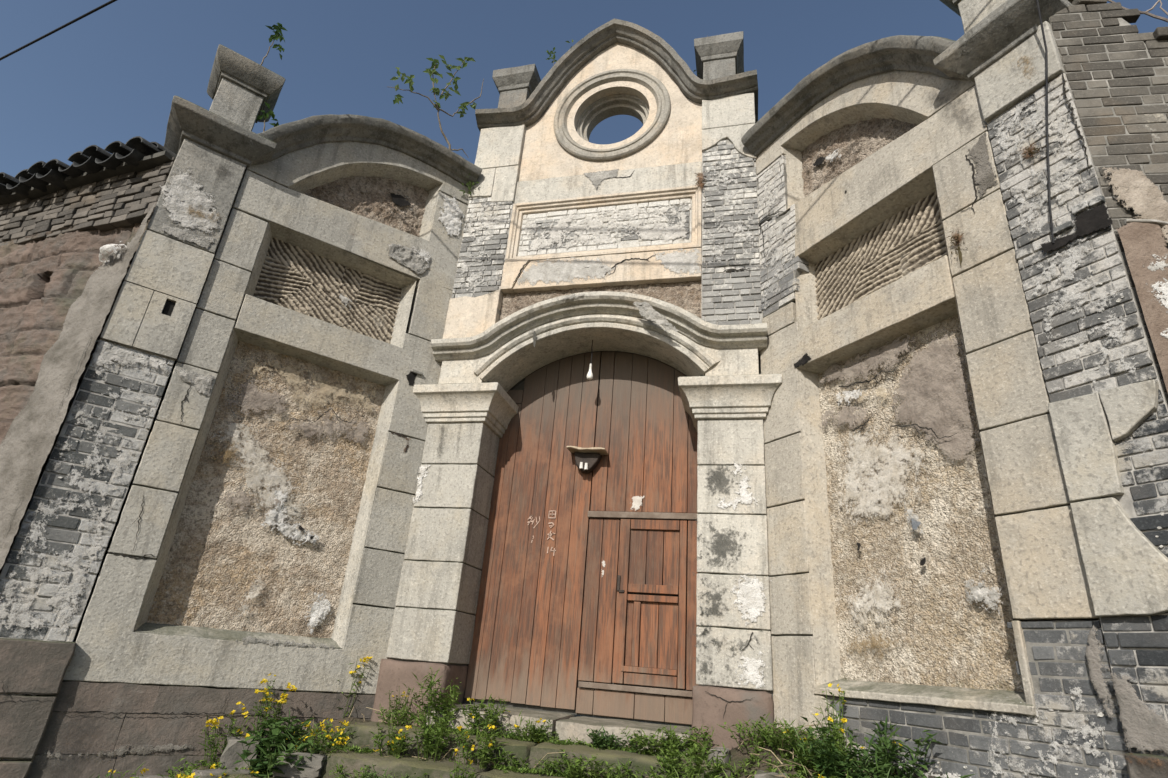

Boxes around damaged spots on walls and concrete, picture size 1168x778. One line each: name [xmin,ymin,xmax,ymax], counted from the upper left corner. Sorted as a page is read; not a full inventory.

spalling [387,243,431,274]
crack [585,254,656,276]
spalling [967,73,1168,557]
spalling [0,167,226,642]
flaking render [213,353,378,547]
flaking render [820,329,980,525]
flaking render [718,463,758,513]
crack [108,496,155,560]
flaking render [731,572,772,626]
flaking render [735,651,765,689]
spalling [825,566,1168,778]